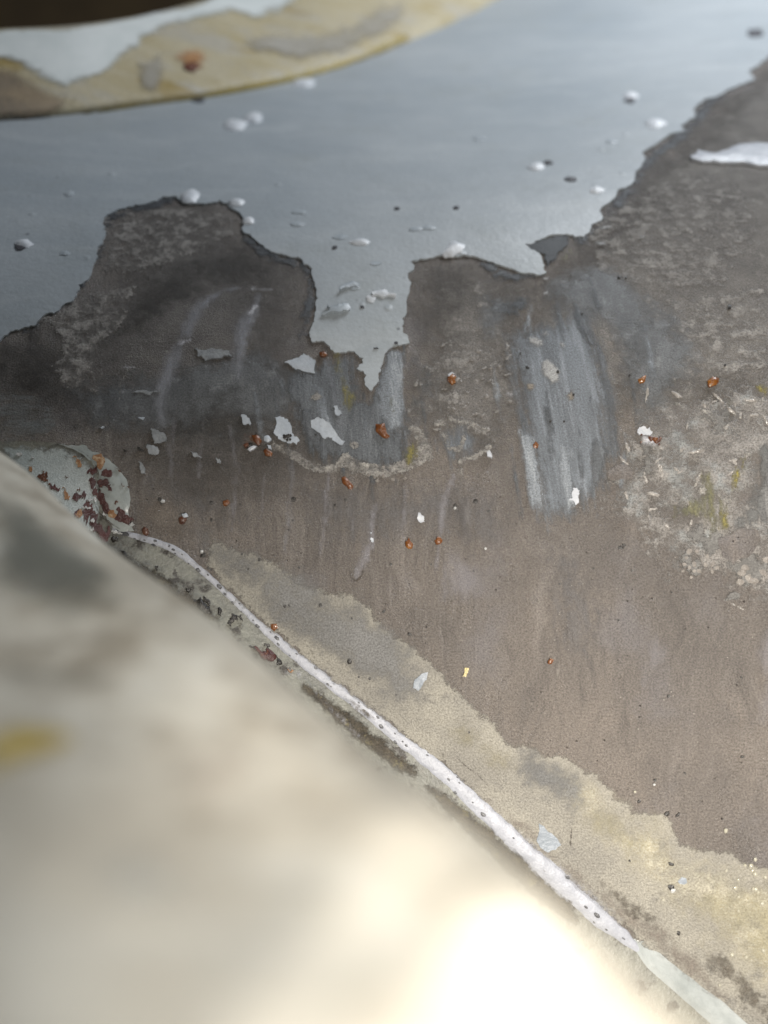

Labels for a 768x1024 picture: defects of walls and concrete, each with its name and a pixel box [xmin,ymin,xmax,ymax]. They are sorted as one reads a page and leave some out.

peeling [406,73,768,459]
peeling [2,197,345,506]
leakage [304,384,332,451]
peeling [375,423,390,439]
leakage [514,415,541,508]
peeling [569,488,579,505]
leakage [545,304,625,509]
corrosion [249,644,294,673]